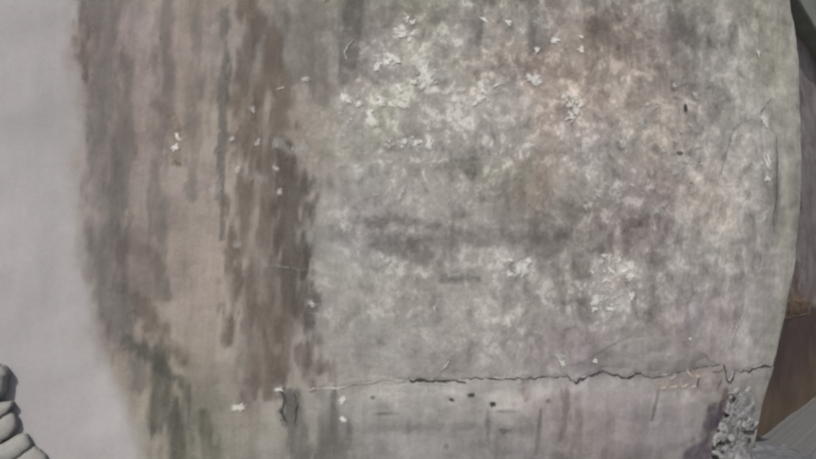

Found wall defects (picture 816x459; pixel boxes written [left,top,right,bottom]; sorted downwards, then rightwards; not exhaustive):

damp [215,52,231,204]
damp [130,344,185,459]
crack [303,364,772,390]